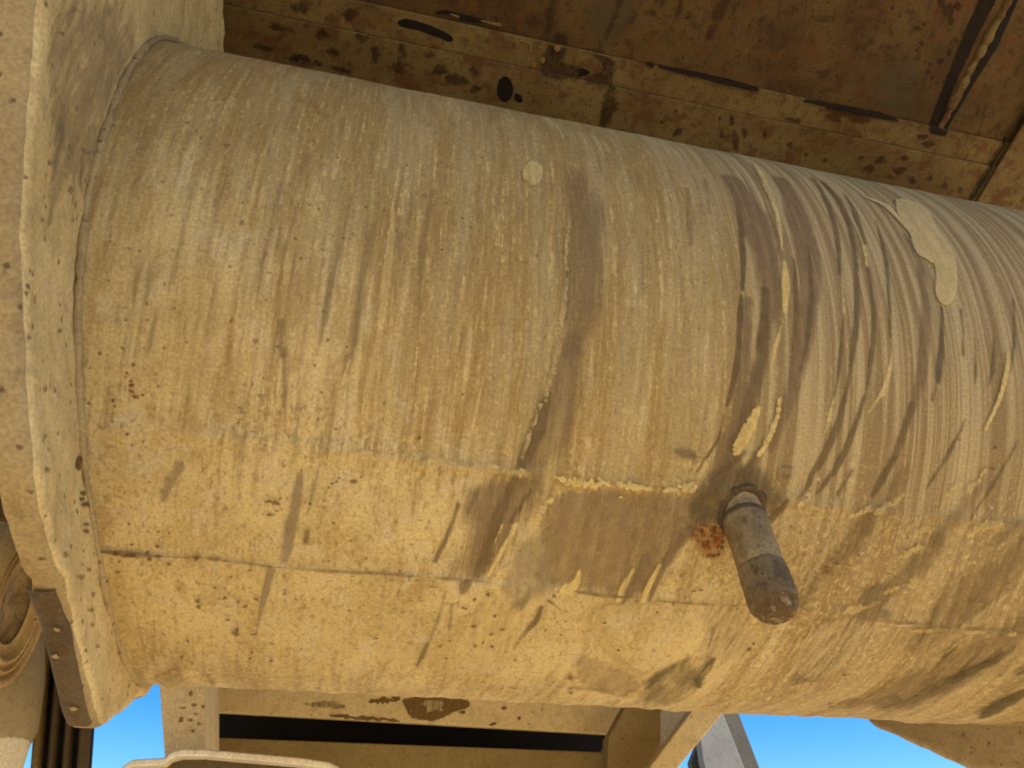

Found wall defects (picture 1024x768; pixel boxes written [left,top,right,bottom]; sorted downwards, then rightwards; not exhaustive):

rust [290,29,351,74]
rust [519,32,617,128]
water stain [433,202,601,594]
water stain [504,164,820,653]
peeling [732,397,783,457]
water stain [799,177,976,605]
peeling [554,475,697,498]
peeling [487,522,519,577]
rust [691,523,728,558]
water stain [840,618,1024,719]
peeling [312,696,470,722]